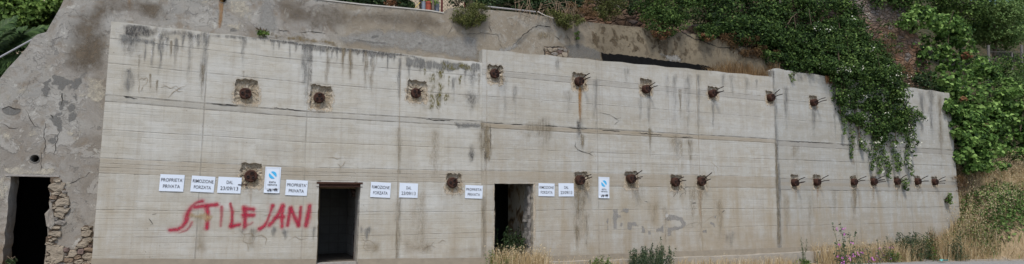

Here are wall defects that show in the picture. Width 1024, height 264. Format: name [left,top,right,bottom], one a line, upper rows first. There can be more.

leakage [122,5,246,61]
leakage [260,33,480,108]
flaking render [3,106,21,115]
flaking render [42,75,104,143]